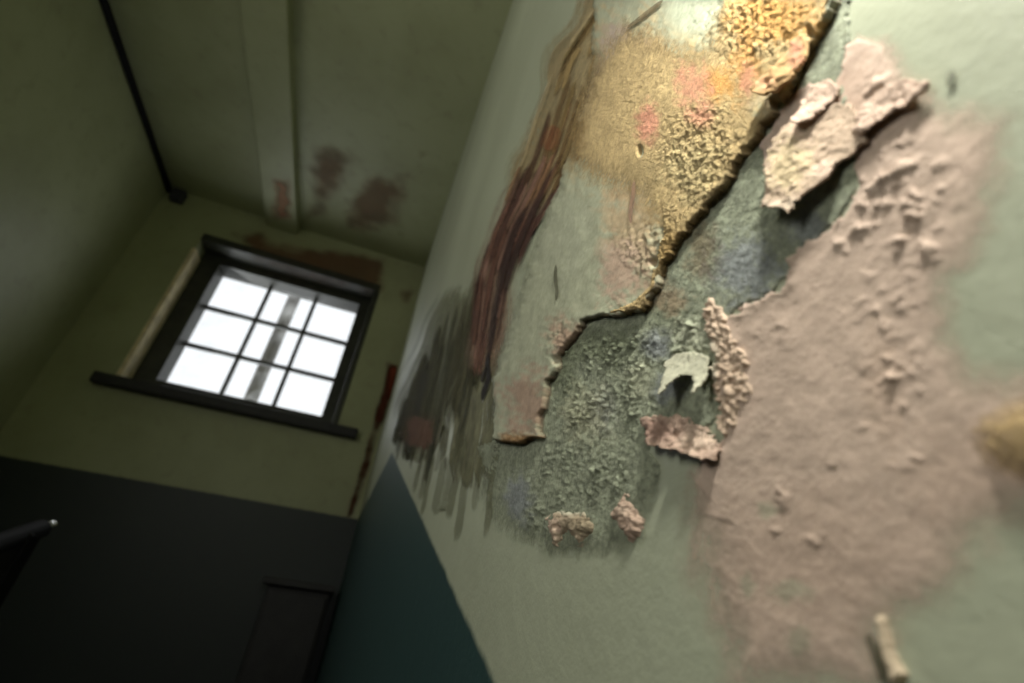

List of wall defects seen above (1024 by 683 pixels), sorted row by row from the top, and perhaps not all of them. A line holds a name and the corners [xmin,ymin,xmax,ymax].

peeling [545,511,594,547]
peeling [492,0,725,445]
peeling [610,493,645,543]
flaking render [639,0,1024,683]